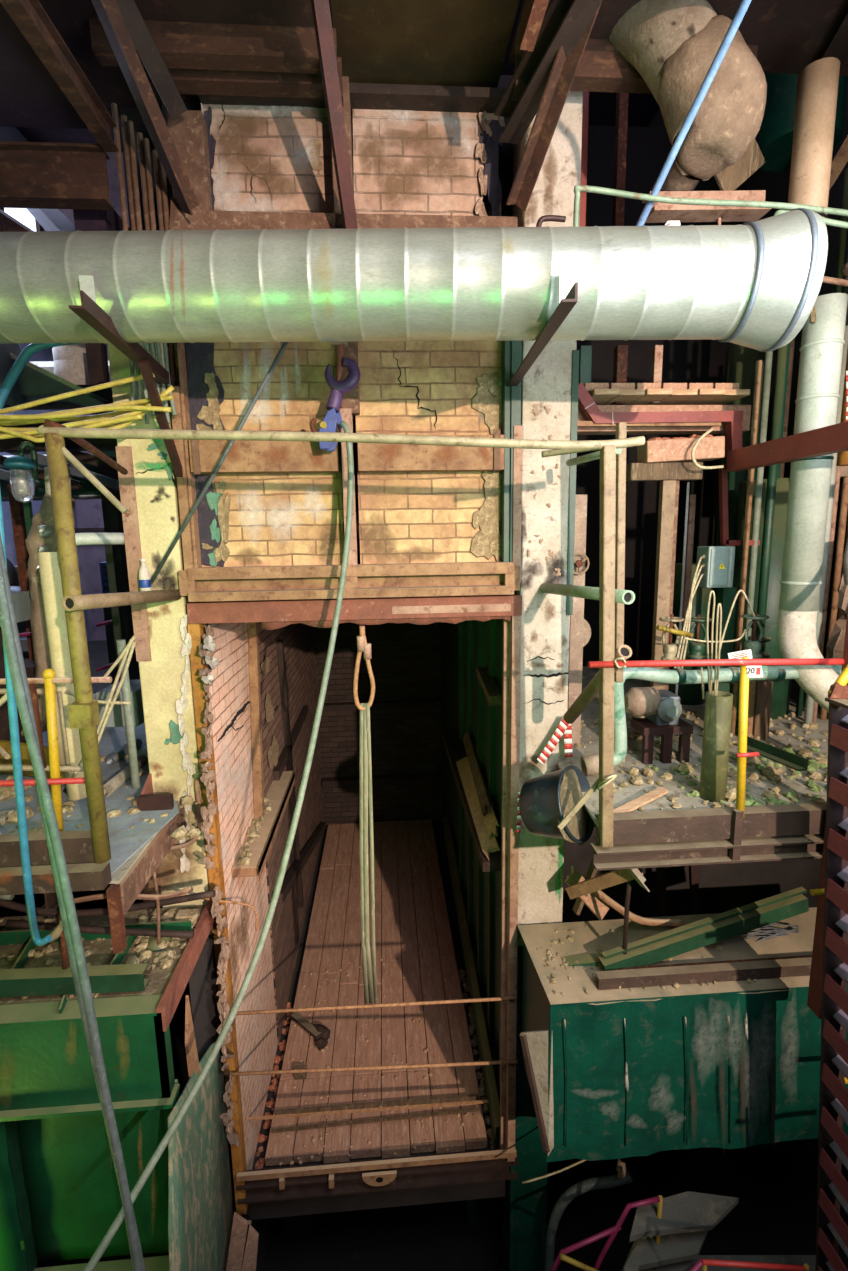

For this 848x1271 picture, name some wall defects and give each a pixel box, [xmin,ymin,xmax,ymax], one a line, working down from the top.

spalling [474,111,505,216]
crack [391,348,437,428]
peeling [469,471,502,562]
spalling [164,614,244,873]
spalling [211,885,240,1147]